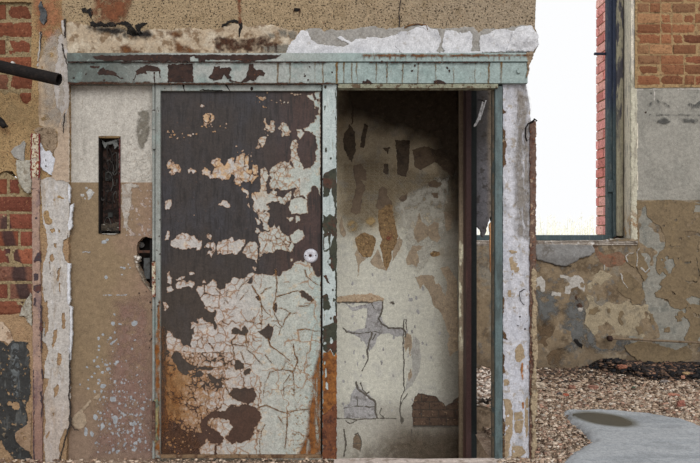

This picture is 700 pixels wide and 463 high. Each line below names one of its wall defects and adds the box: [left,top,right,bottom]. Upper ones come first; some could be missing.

corrosion [149,301,200,455]
crack [204,270,317,453]
peeling [0,1,534,462]
corrosion [299,350,337,459]
peeling [536,200,700,363]